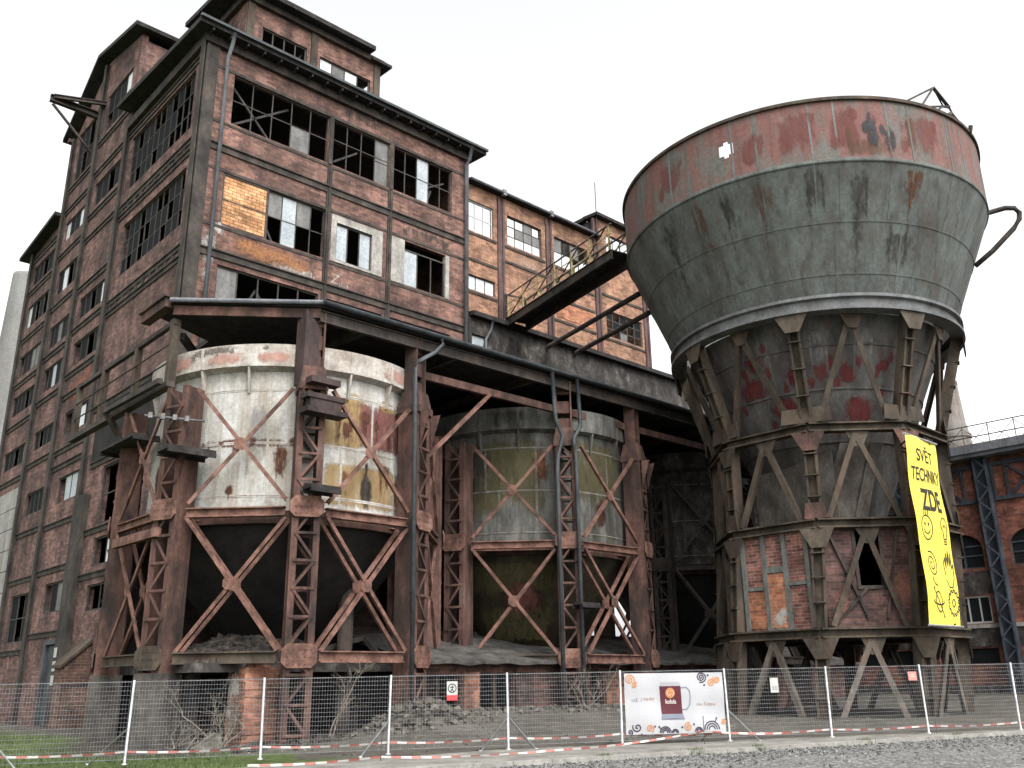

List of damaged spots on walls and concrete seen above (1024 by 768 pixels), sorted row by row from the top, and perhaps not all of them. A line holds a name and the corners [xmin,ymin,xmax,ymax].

corrosion [904,170,923,209]
spalling [176,347,243,371]
peeling [258,345,288,362]
corrosion [324,394,364,449]
corrosion [202,437,294,477]
corrosion [324,464,397,513]